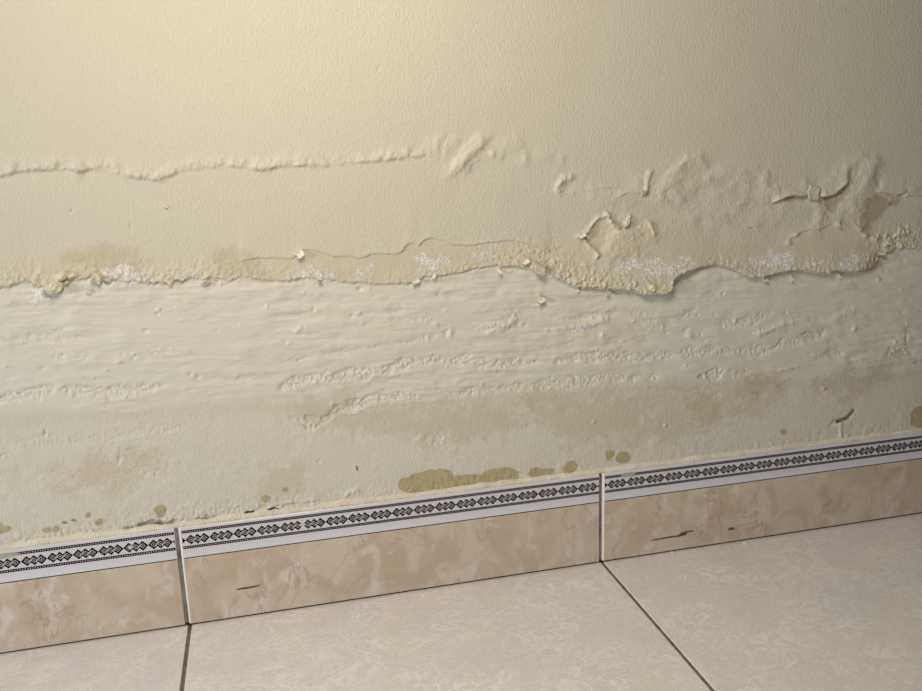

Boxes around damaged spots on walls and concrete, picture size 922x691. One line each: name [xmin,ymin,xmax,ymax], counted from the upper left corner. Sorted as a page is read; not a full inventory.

spalling [880,211,922,256]
damp [102,262,139,285]
peeling [0,227,557,296]
damp [613,255,694,281]
damp [749,247,794,274]
damp [911,406,922,428]
damp [605,450,631,464]
damp [398,461,577,493]